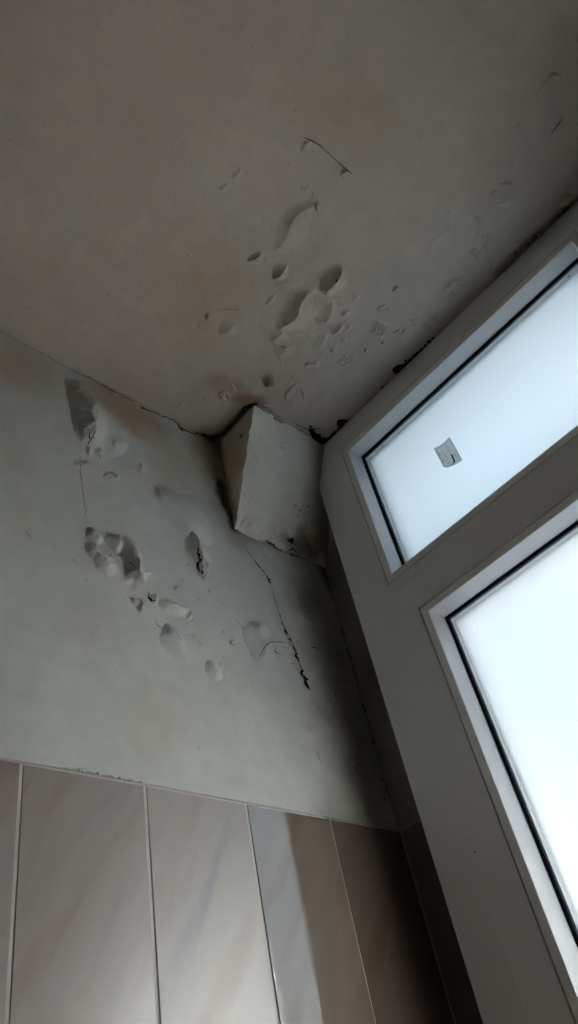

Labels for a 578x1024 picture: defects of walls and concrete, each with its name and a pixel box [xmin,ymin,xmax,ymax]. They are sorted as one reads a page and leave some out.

crack [238,531,357,713]